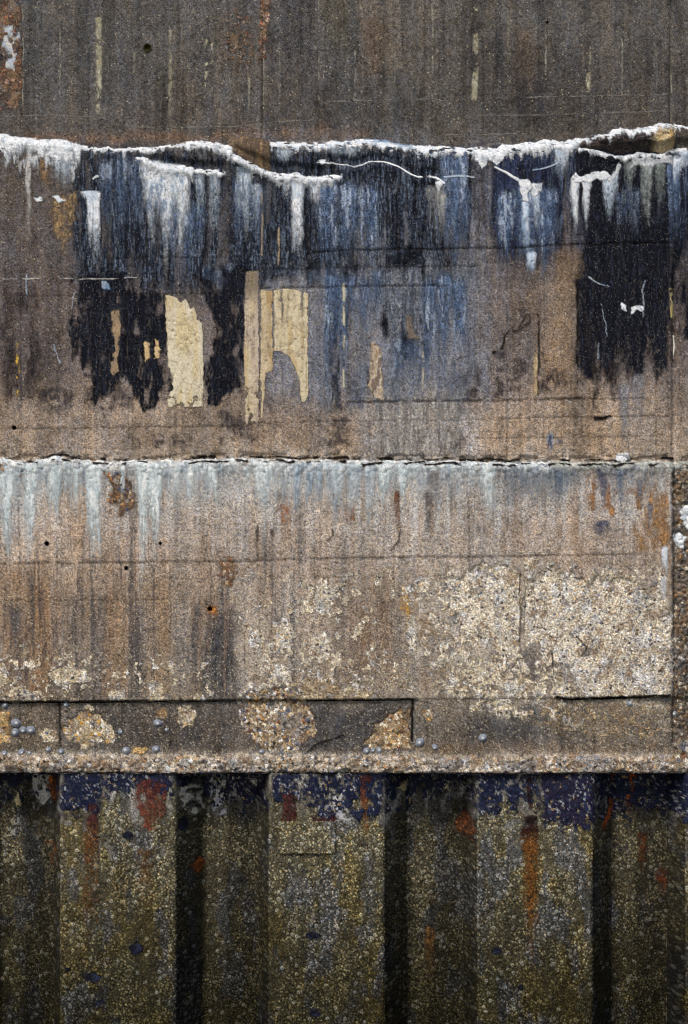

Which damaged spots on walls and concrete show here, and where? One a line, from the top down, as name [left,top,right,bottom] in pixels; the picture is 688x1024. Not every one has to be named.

peeling [143,295,204,408]
peeling [243,271,309,425]
leakage [0,123,688,565]
corrosion [588,483,615,515]
corrosion [629,486,671,551]
spalling [0,469,688,826]
corrosion [83,804,98,912]
corrosion [132,778,167,831]
corrosion [521,777,540,947]